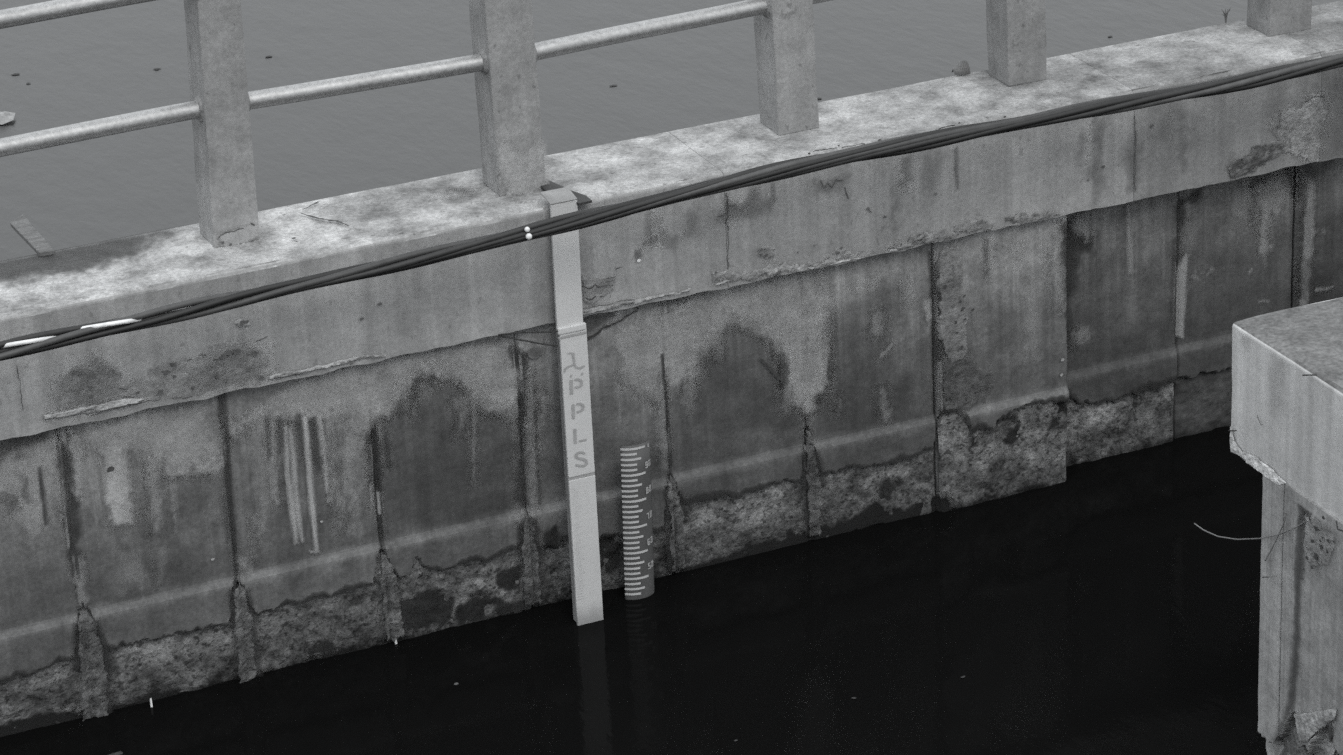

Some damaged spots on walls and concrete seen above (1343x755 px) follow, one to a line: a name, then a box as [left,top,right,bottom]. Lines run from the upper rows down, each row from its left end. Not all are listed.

damp [0,393,237,578]
spalling [0,525,572,728]
damp [252,340,536,552]
spalling [599,533,625,591]
damp [613,271,826,459]
spalling [653,210,1177,578]
spalling [1230,426,1286,485]
spalling [1280,708,1339,755]